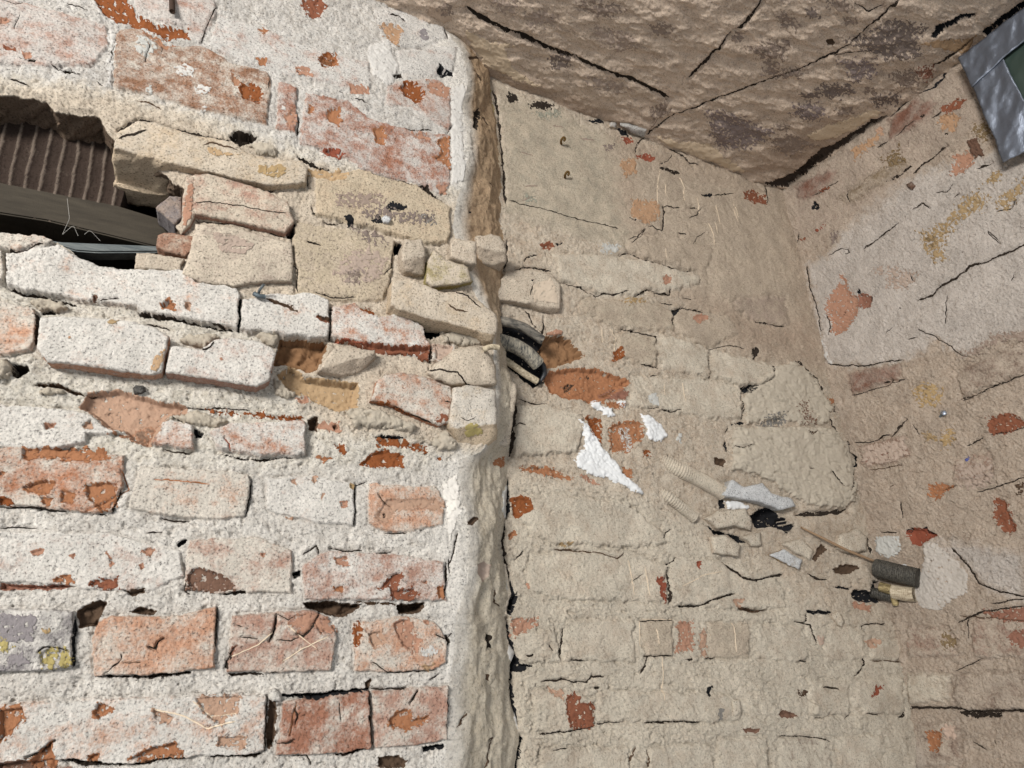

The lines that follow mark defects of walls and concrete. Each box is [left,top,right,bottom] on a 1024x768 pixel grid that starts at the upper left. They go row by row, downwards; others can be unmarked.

flaking render [94,0,191,50]
flaking render [349,22,466,195]
crack [467,0,899,153]
hole [84,259,136,270]
spalling [181,174,294,288]
spalling [335,250,561,362]
crack [767,199,1024,443]
flaking render [543,346,651,457]
crack [493,399,547,720]
crack [633,529,782,622]
crack [795,464,903,554]
crack [952,548,1024,671]